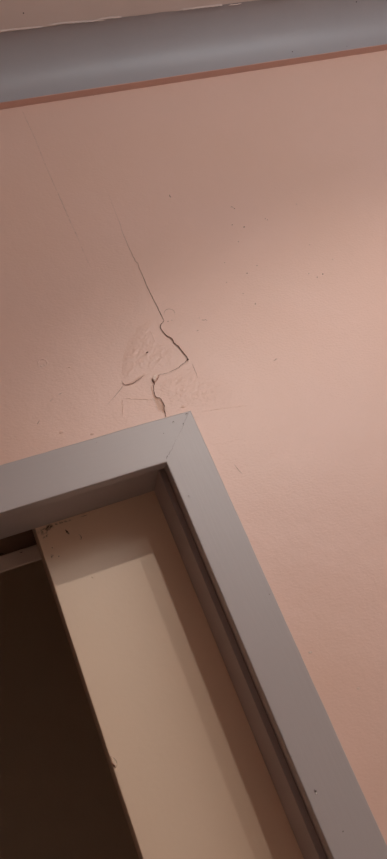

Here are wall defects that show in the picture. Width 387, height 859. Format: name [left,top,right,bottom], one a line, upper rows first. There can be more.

crack [119,244,189,418]